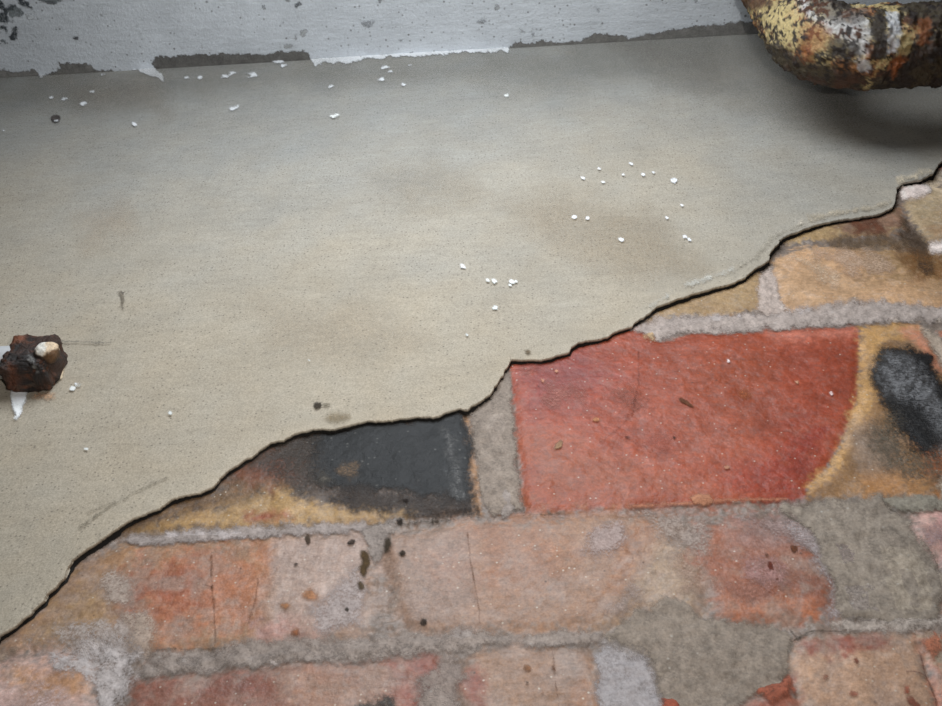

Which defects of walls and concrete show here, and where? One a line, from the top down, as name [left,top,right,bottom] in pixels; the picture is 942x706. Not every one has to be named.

damp [878,354,942,430]
spalling [662,698,680,706]
spalling [757,675,796,703]